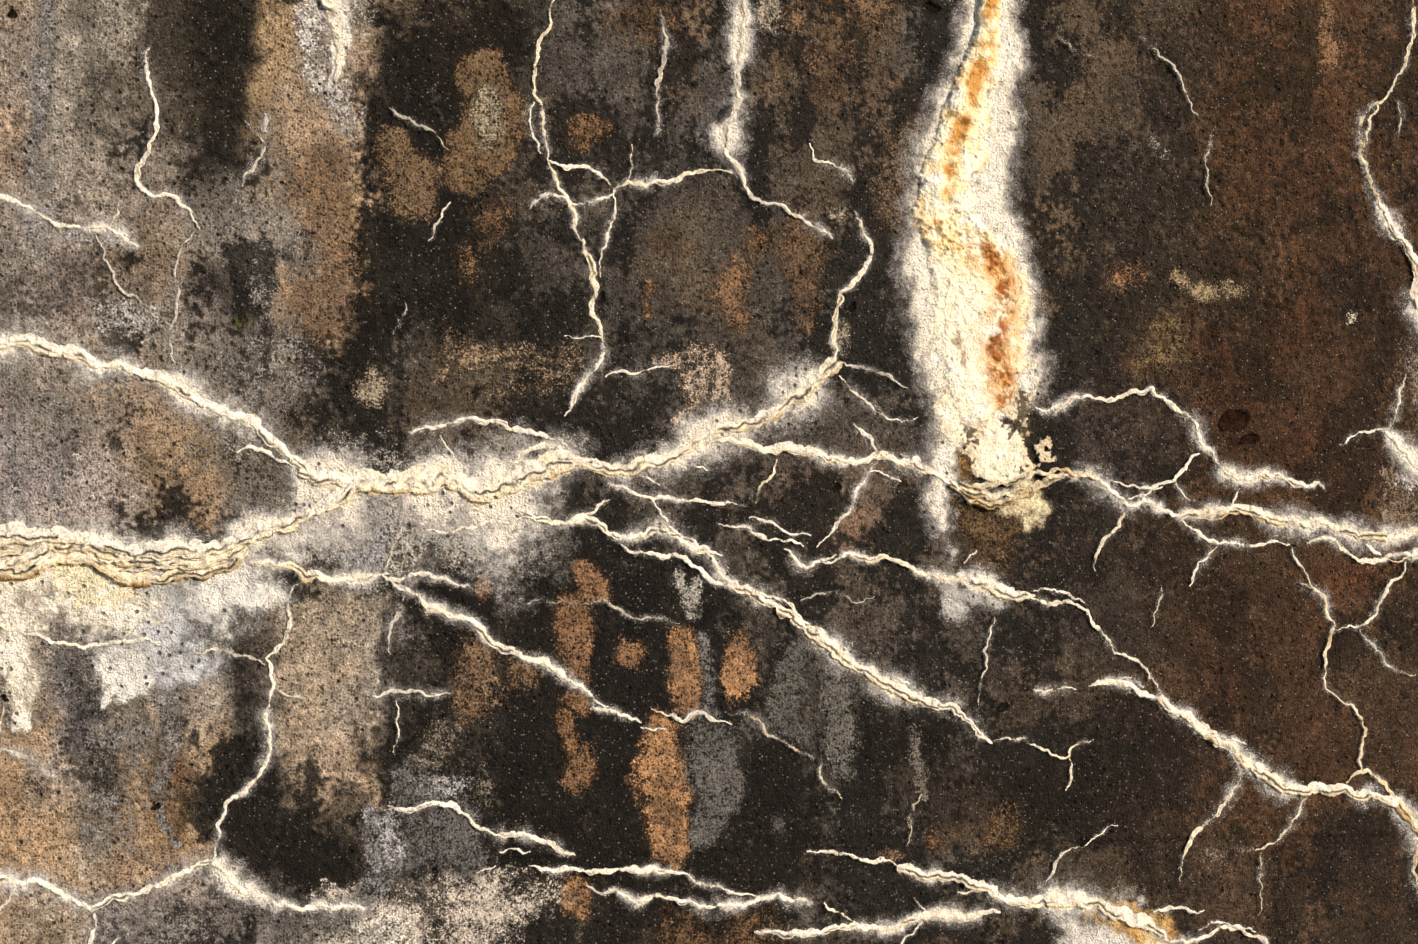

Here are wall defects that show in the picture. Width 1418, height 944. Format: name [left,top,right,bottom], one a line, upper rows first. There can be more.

damp [0,292,184,562]
damp [0,556,290,865]
crack [134,47,200,364]
damp [354,363,390,409]
damp [273,493,502,600]
crack [389,108,449,150]
crack [528,0,833,416]
crack [0,193,1418,944]
damp [870,0,1057,620]
crack [1153,48,1216,205]
crack [1358,1,1418,329]
damp [111,887,269,944]